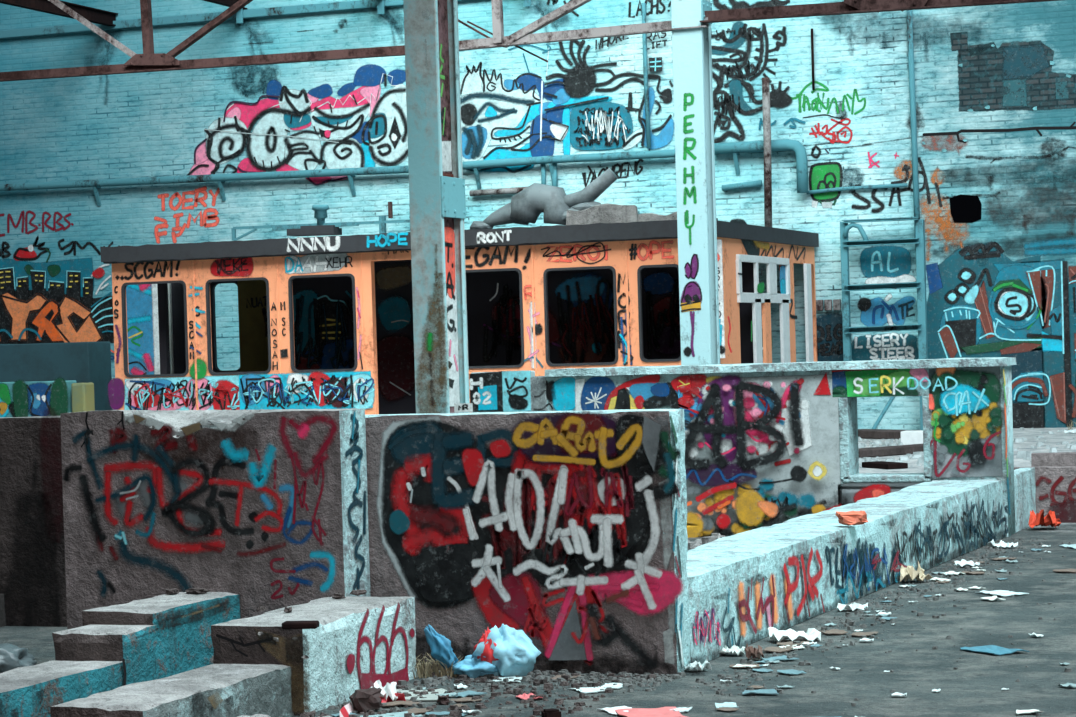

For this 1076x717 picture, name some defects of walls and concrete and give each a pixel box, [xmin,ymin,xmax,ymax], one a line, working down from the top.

water stain [827,14,944,49]
flaking render [950,32,1076,112]
water stain [944,161,1076,252]
rust [417,244,449,414]